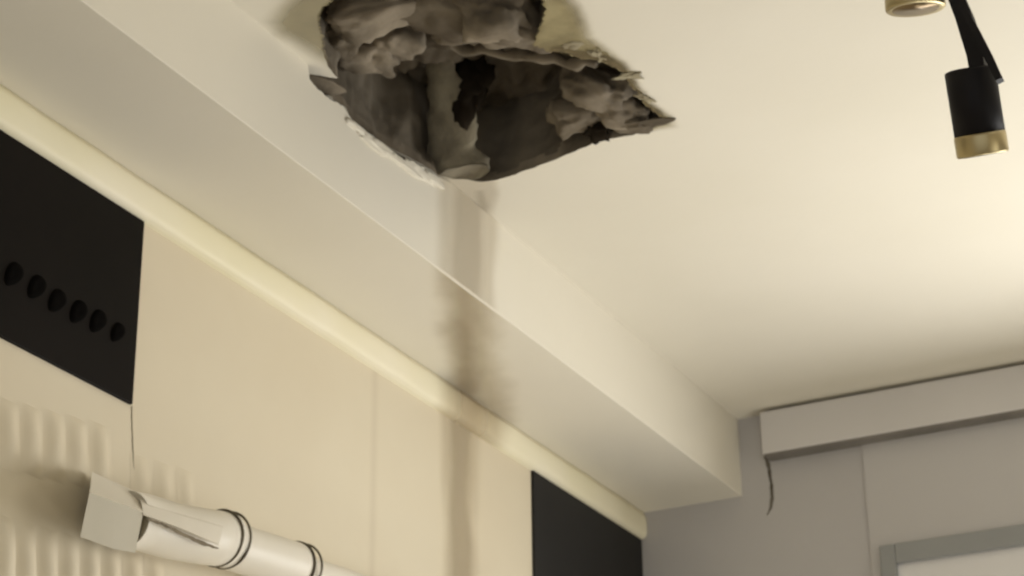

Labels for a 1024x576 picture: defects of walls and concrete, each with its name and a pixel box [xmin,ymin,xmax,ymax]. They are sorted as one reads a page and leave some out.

flaking render [309,75,347,95]
flaking render [533,0,676,129]
crack [128,406,136,466]
crack [764,457,774,515]